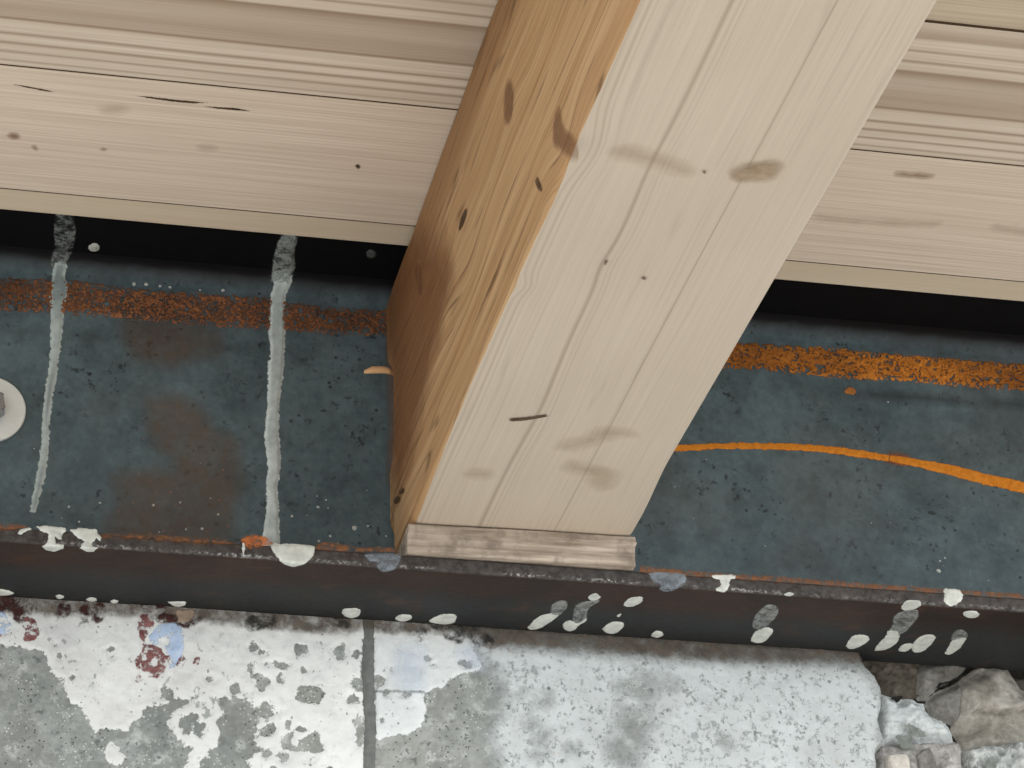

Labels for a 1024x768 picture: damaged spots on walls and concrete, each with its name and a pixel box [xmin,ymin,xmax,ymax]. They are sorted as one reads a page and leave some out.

corrosion [0,277,387,336]
corrosion [724,342,1024,395]
corrosion [103,534,272,549]
corrosion [316,542,396,552]
corrosion [640,566,944,593]
peeling [0,597,482,768]